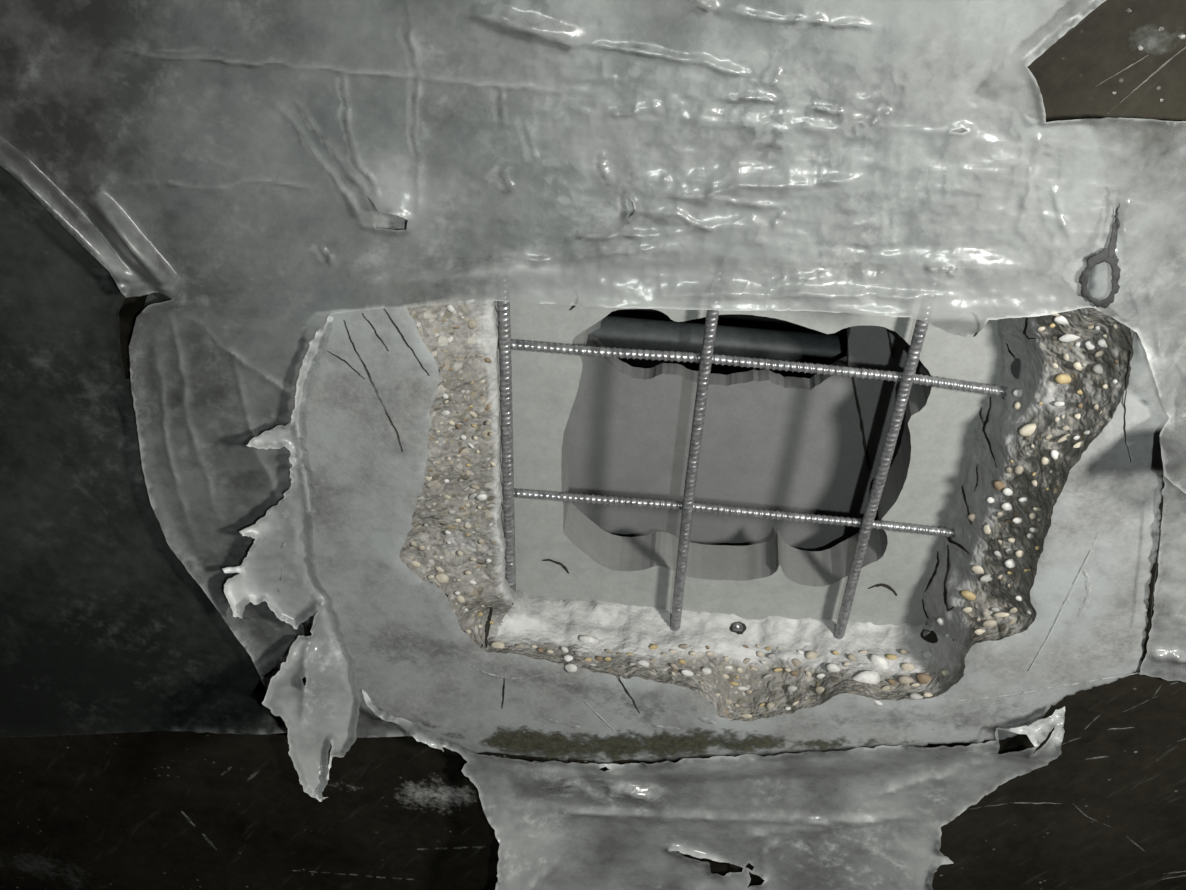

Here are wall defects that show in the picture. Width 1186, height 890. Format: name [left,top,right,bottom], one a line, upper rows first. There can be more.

crack [327,308,430,452]
peeling [133,0,1186,763]
leakage [482,713,785,761]
leakage [799,739,846,750]